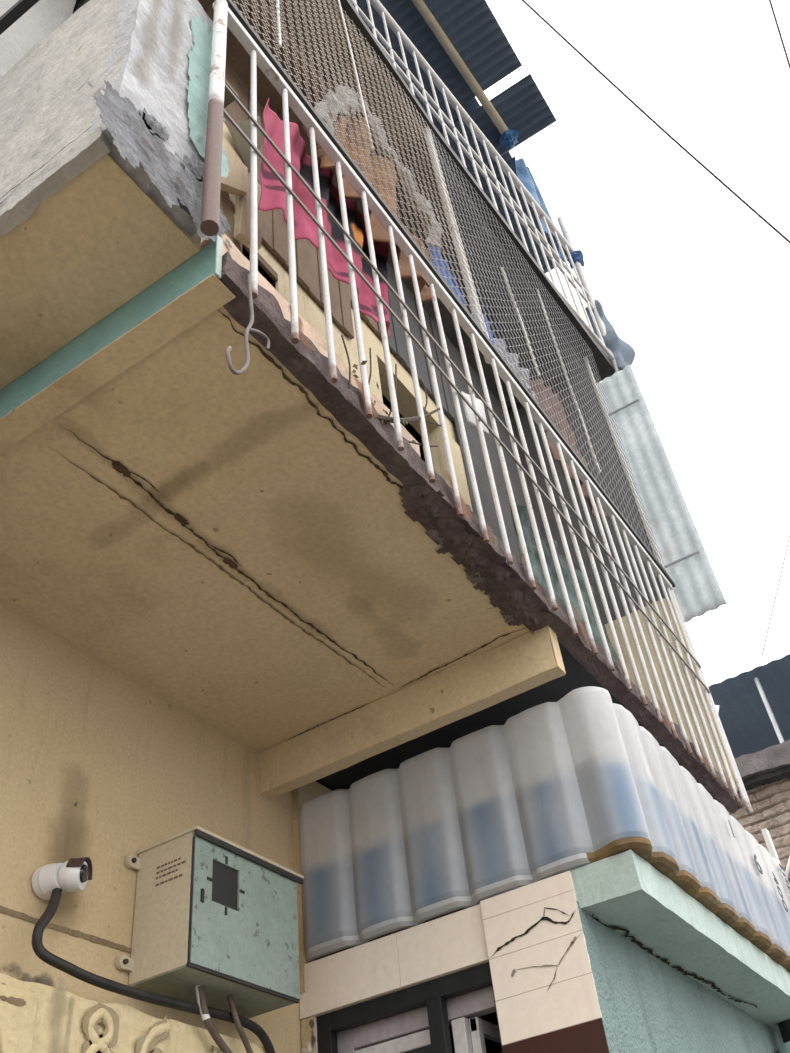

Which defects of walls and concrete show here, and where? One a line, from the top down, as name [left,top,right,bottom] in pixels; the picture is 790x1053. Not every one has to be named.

crack [0,119,100,204]
spalling [87,16,232,249]
spalling [289,305,311,350]
spalling [355,379,376,417]
crack [48,429,525,740]
spalling [398,474,554,632]
crack [488,907,757,1008]